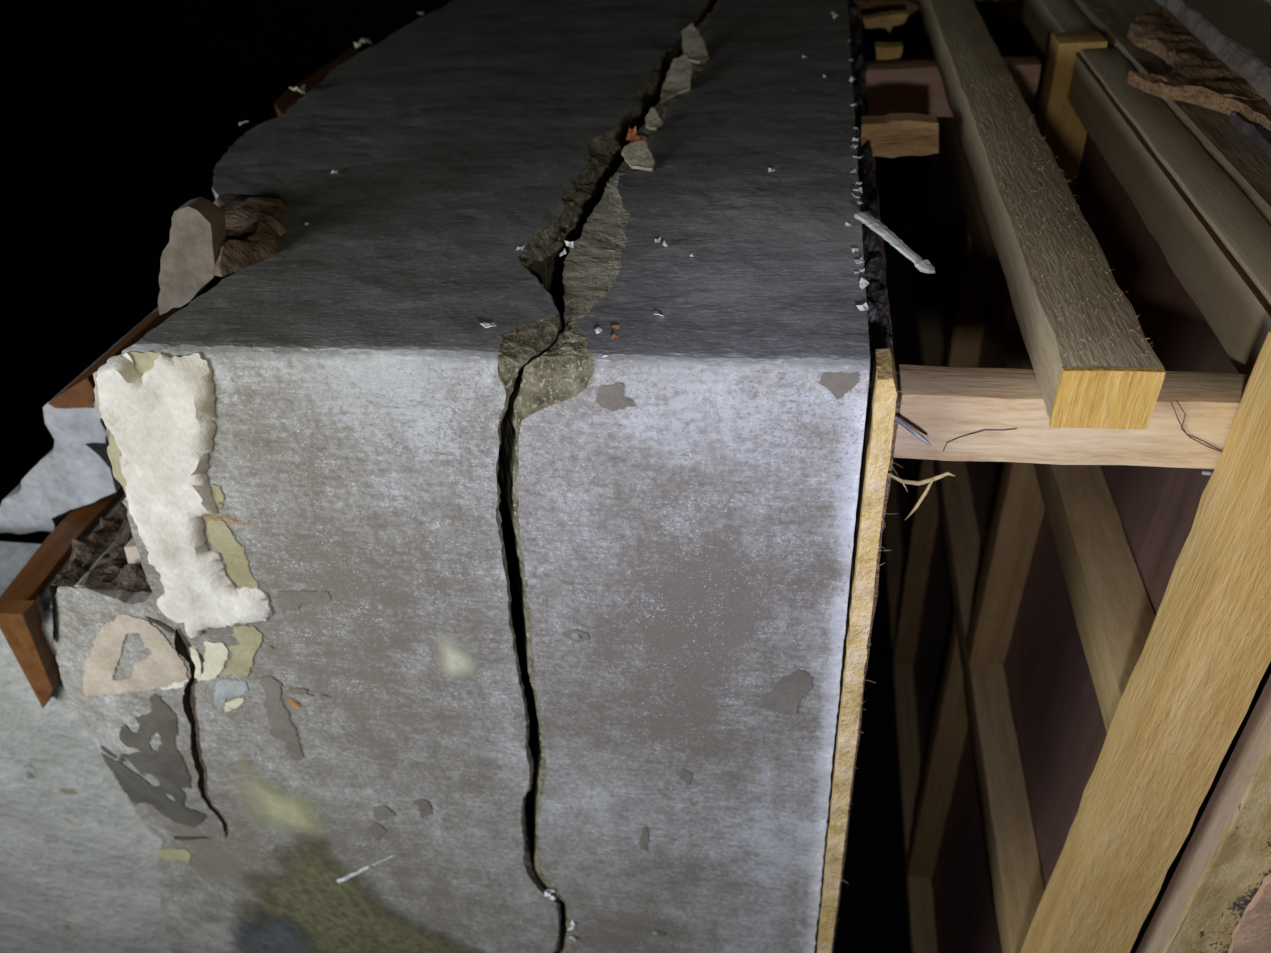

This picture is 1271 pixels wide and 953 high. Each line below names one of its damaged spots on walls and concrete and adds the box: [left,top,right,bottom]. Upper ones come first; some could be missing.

flaking render [213,193,288,277]
crack [144,616,229,840]
flaking render [81,351,331,827]
crack [496,0,720,953]